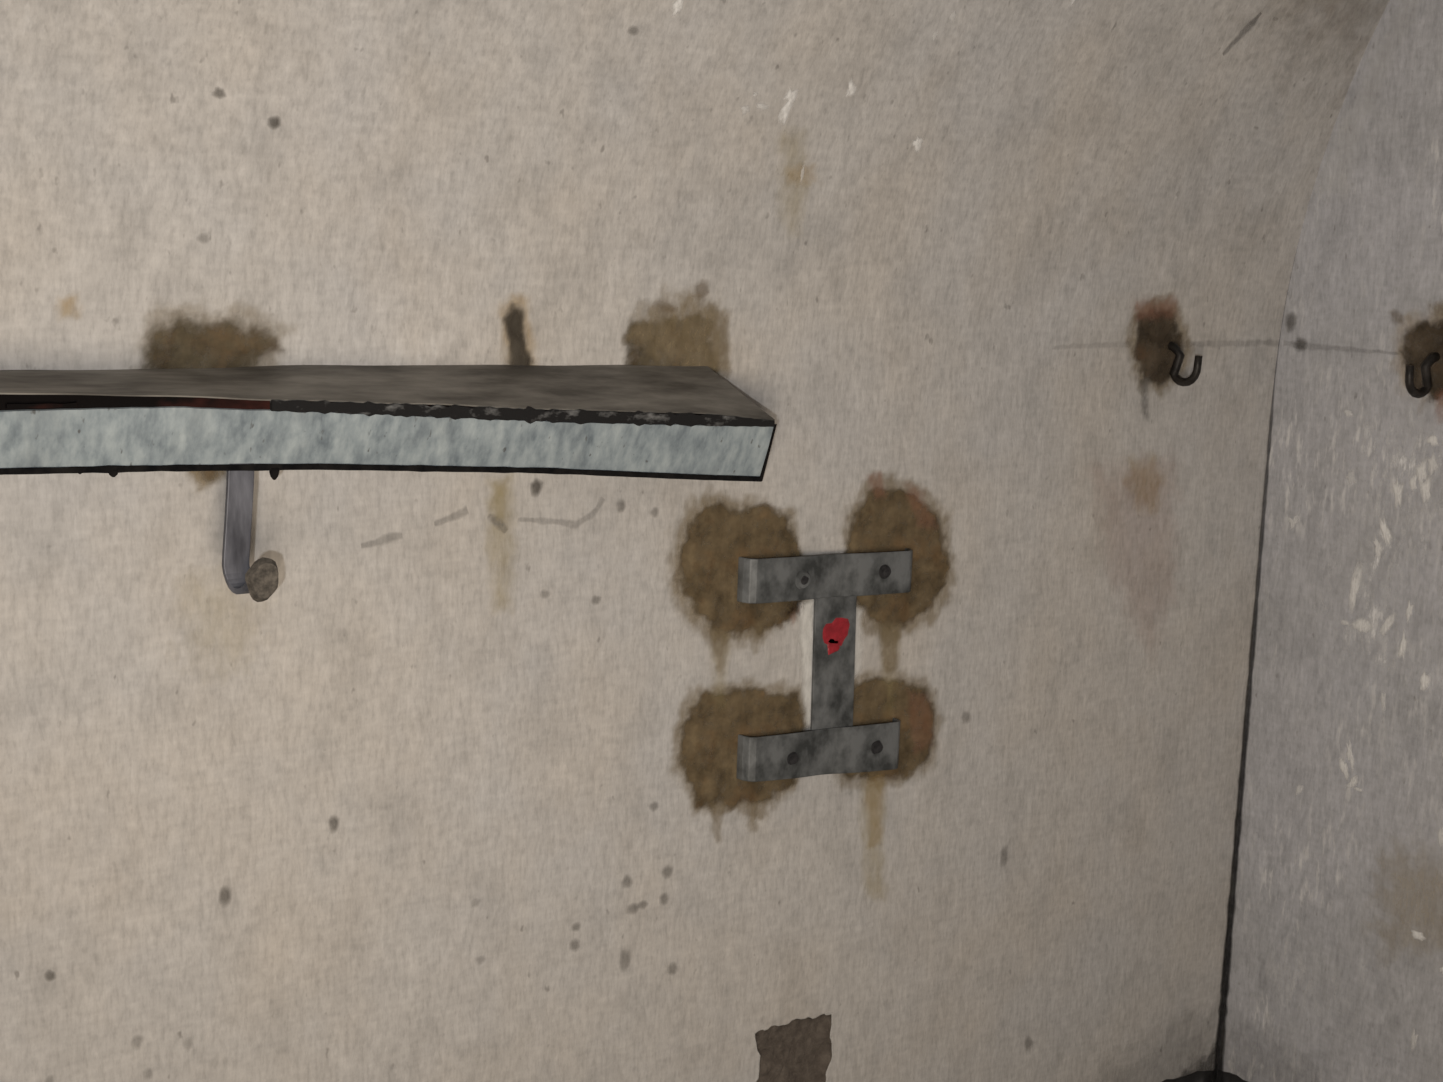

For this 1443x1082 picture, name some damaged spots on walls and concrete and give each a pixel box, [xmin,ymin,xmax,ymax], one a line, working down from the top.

corrosion [505,308,531,366]
spalling [755,1014,832,1082]